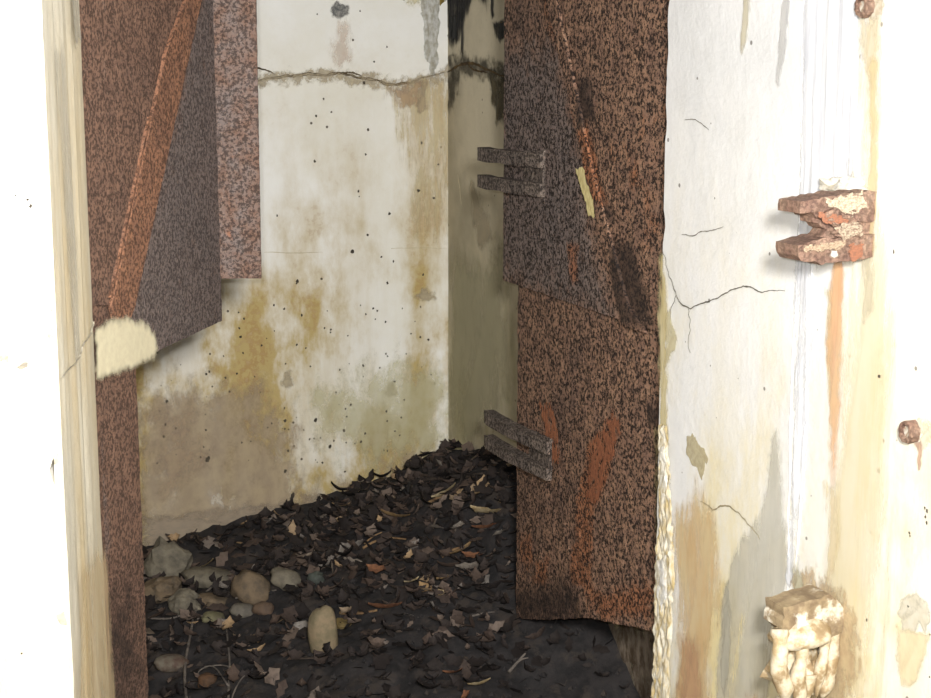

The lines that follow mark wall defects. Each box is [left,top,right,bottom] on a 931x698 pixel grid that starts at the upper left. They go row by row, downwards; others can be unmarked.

damp [73,0,81,43]
crack [258,56,504,107]
damp [740,0,748,51]
damp [777,0,789,82]
damp [800,0,878,194]
damp [797,215,813,236]
crack [662,250,784,351]
corrosion [818,208,864,461]
corrosion [586,409,622,504]
damp [831,248,888,689]